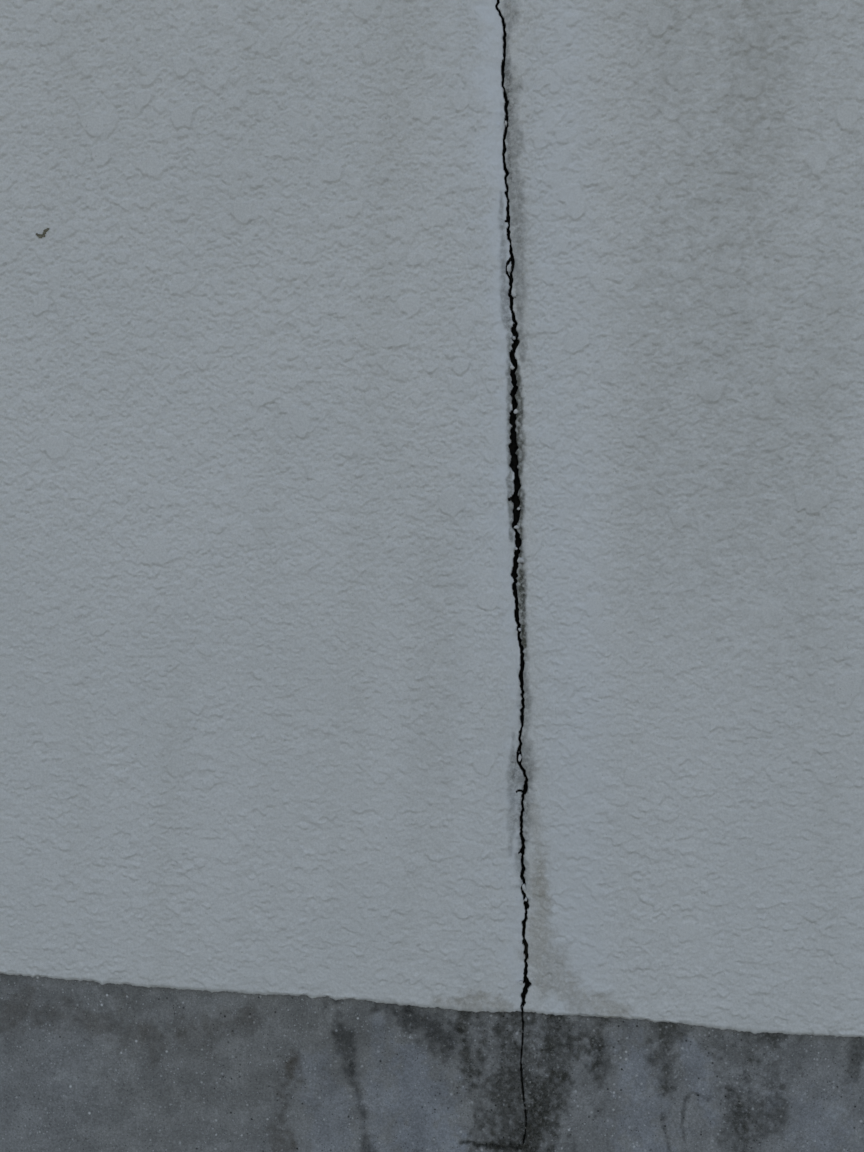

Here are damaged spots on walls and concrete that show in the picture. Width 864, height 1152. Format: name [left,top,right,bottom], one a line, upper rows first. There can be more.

crack [495,0,531,1145]